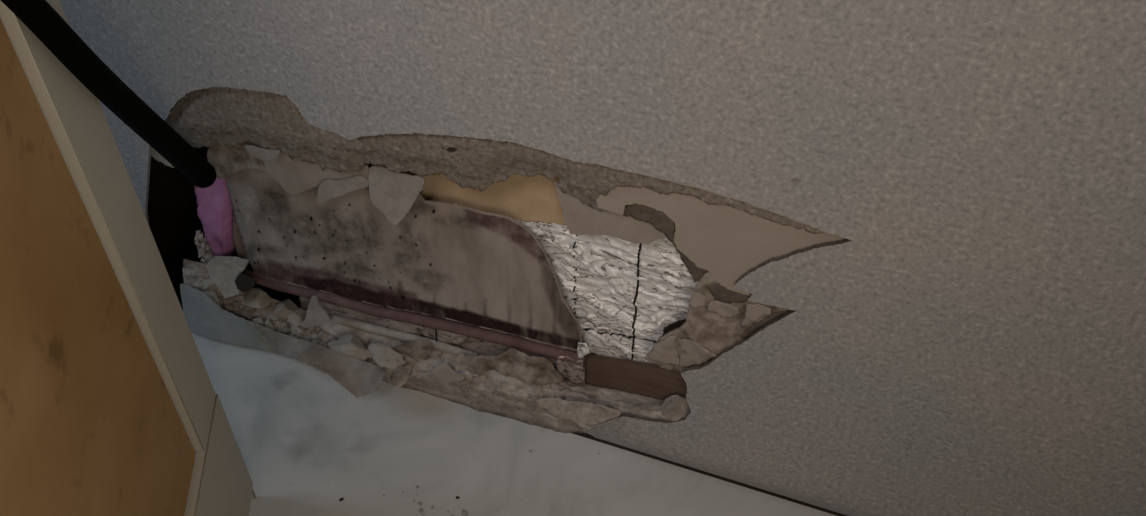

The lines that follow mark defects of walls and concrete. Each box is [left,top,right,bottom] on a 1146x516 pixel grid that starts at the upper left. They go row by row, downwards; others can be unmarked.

damp [241,230,581,350]
flaking render [180,258,669,435]
damp [467,210,545,260]
flaking render [166,87,847,340]